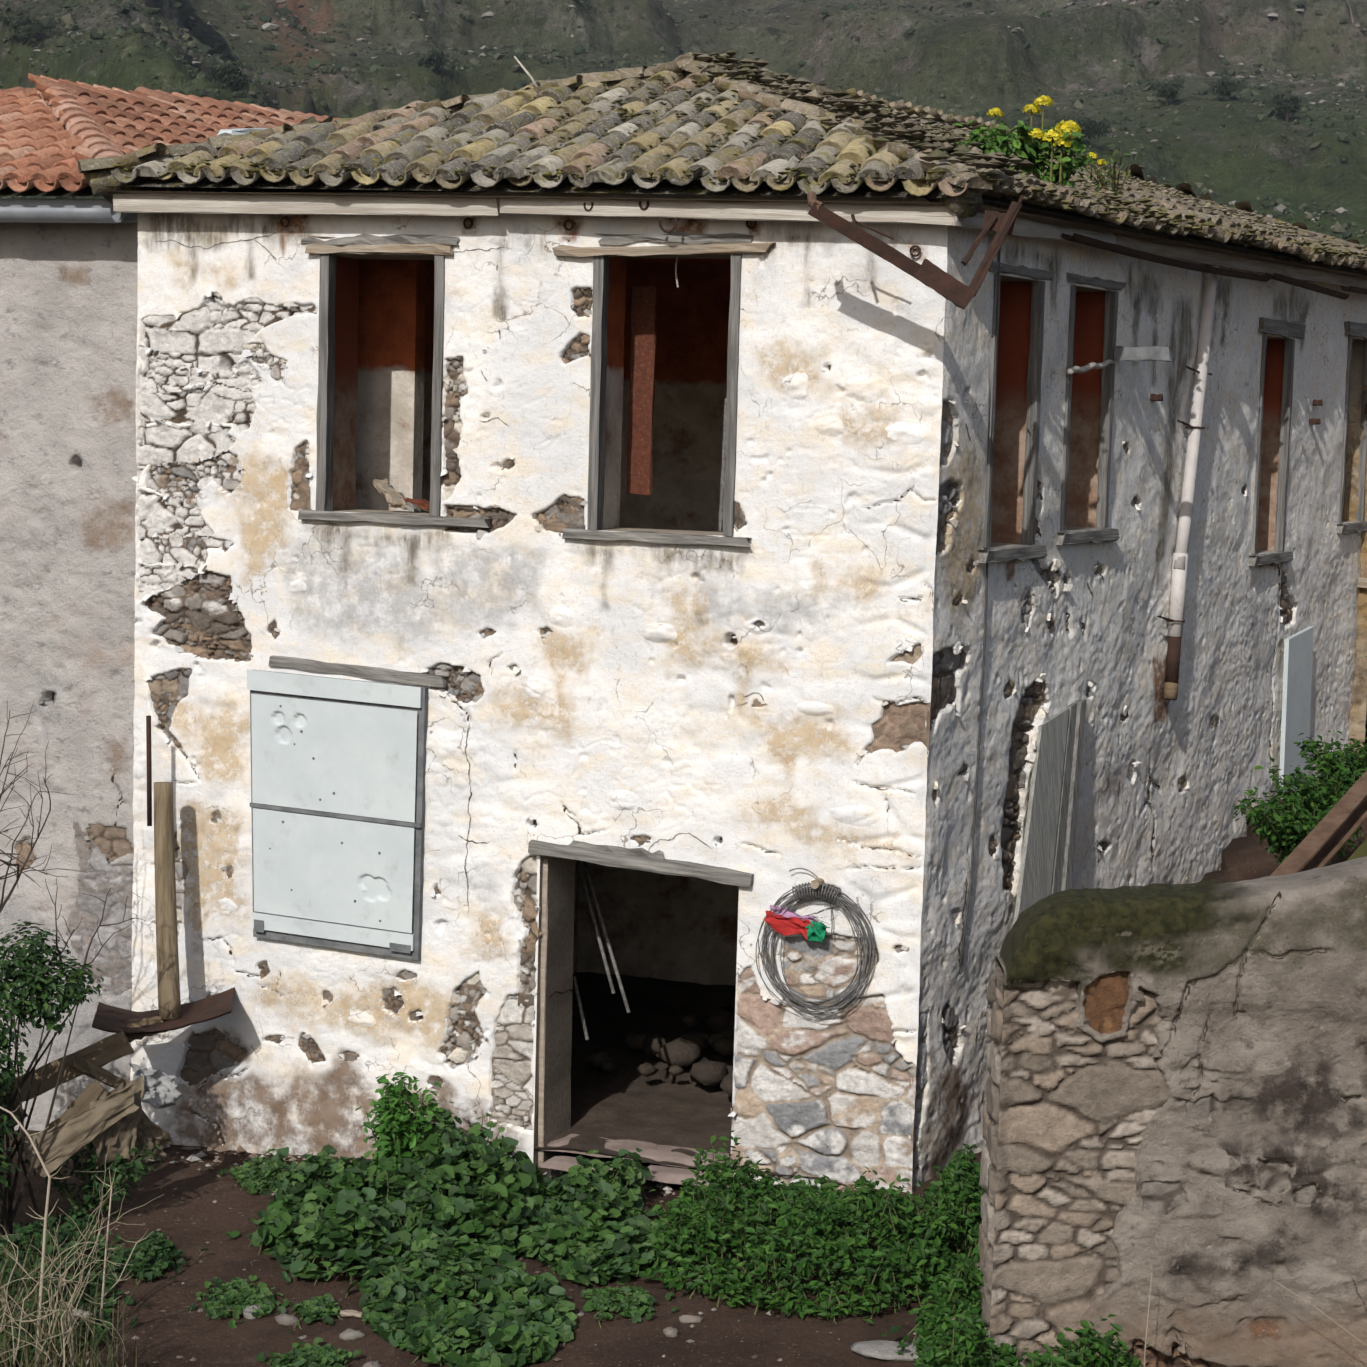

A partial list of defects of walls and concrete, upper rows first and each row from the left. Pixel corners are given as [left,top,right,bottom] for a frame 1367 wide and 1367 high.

damp [1212,283,1230,344]
spalling [132,291,317,758]
spalling [440,356,588,539]
damp [1128,271,1192,567]
crack [563,805,606,834]
crack [649,833,708,849]
spalling [856,642,967,756]
spalling [989,673,1049,890]
spalling [728,933,966,1194]
crack [1156,891,1329,1102]
damp [1222,1144,1362,1217]
damp [1249,1063,1363,1134]